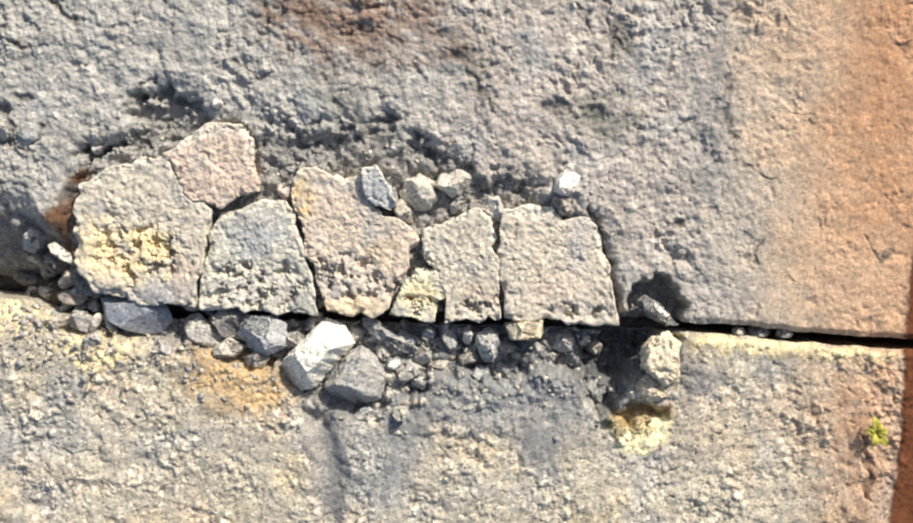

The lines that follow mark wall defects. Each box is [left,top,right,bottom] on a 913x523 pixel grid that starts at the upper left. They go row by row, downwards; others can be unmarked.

spalling [300,365,340,415]
spalling [0,116,688,391]